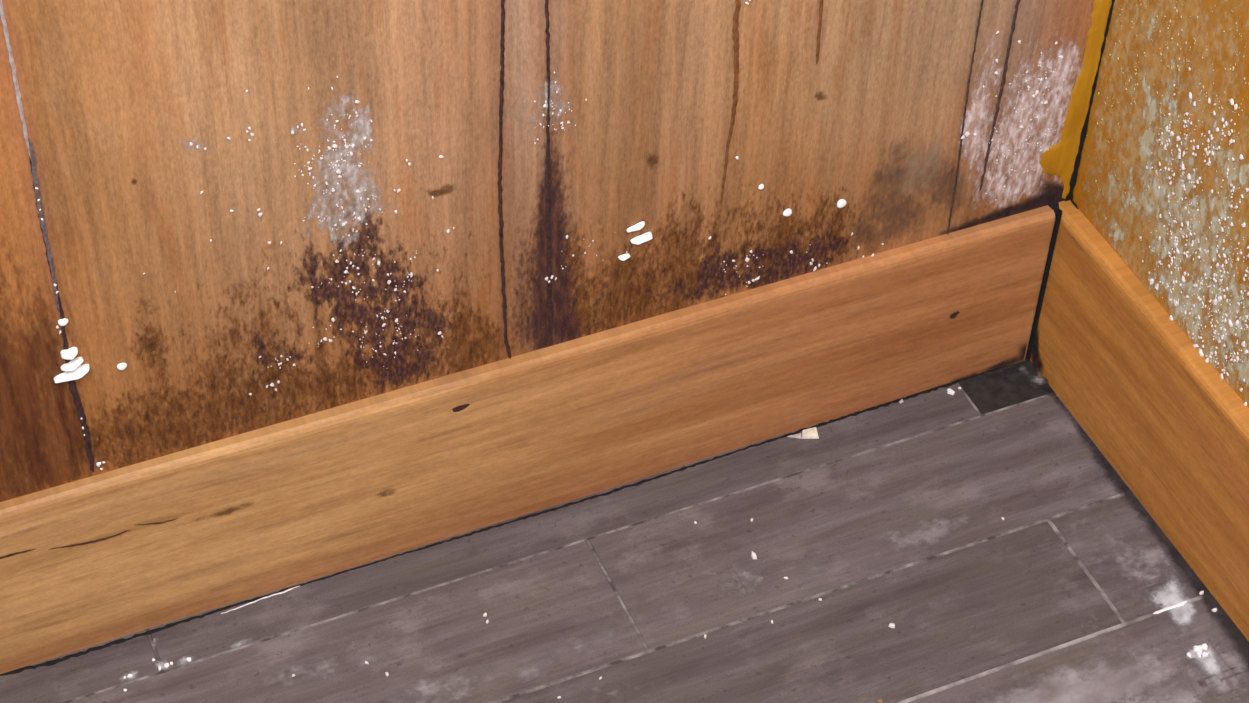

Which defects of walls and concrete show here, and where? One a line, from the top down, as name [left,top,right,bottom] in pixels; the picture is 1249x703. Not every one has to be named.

crack [28,139,106,472]
water stain [0,76,503,495]
crack [498,0,511,359]
crack [545,0,553,346]
water stain [534,72,576,144]
water stain [516,147,936,350]
crack [721,0,741,203]
crack [815,0,823,64]
crack [947,0,1020,235]
water stain [946,41,1083,234]
crack [1025,0,1115,360]
crack [0,365,1008,676]